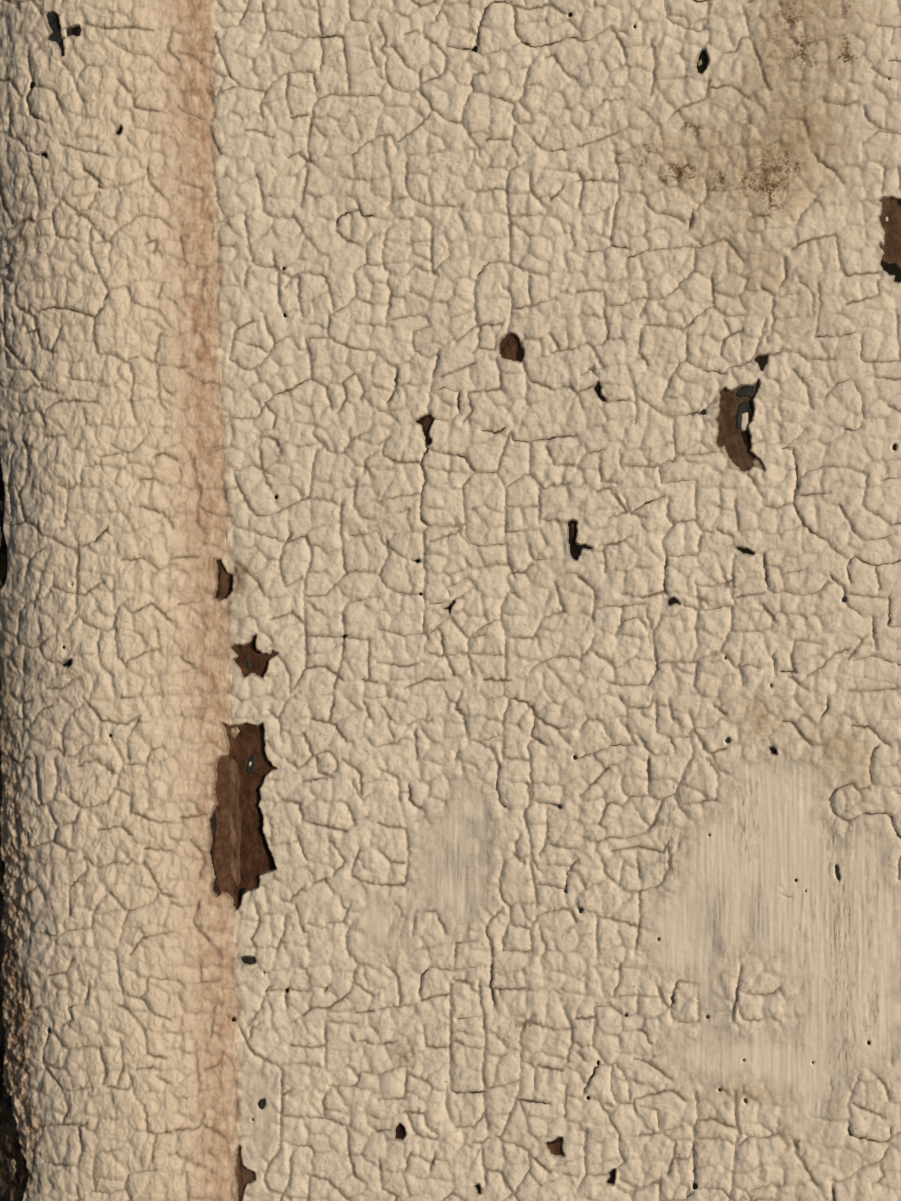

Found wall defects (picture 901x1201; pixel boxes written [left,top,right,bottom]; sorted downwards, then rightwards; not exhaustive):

crack [13,54,101,155]
crack [4,165,302,370]
peeling [879,198,901,283]
crack [110,0,901,808]
peeling [716,355,768,471]
peeling [568,520,591,560]
peeling [231,636,277,677]
crack [21,738,162,849]
peeling [210,724,276,909]
peeling [0,827,29,1201]
crack [10,856,169,999]
crack [225,695,796,1201]